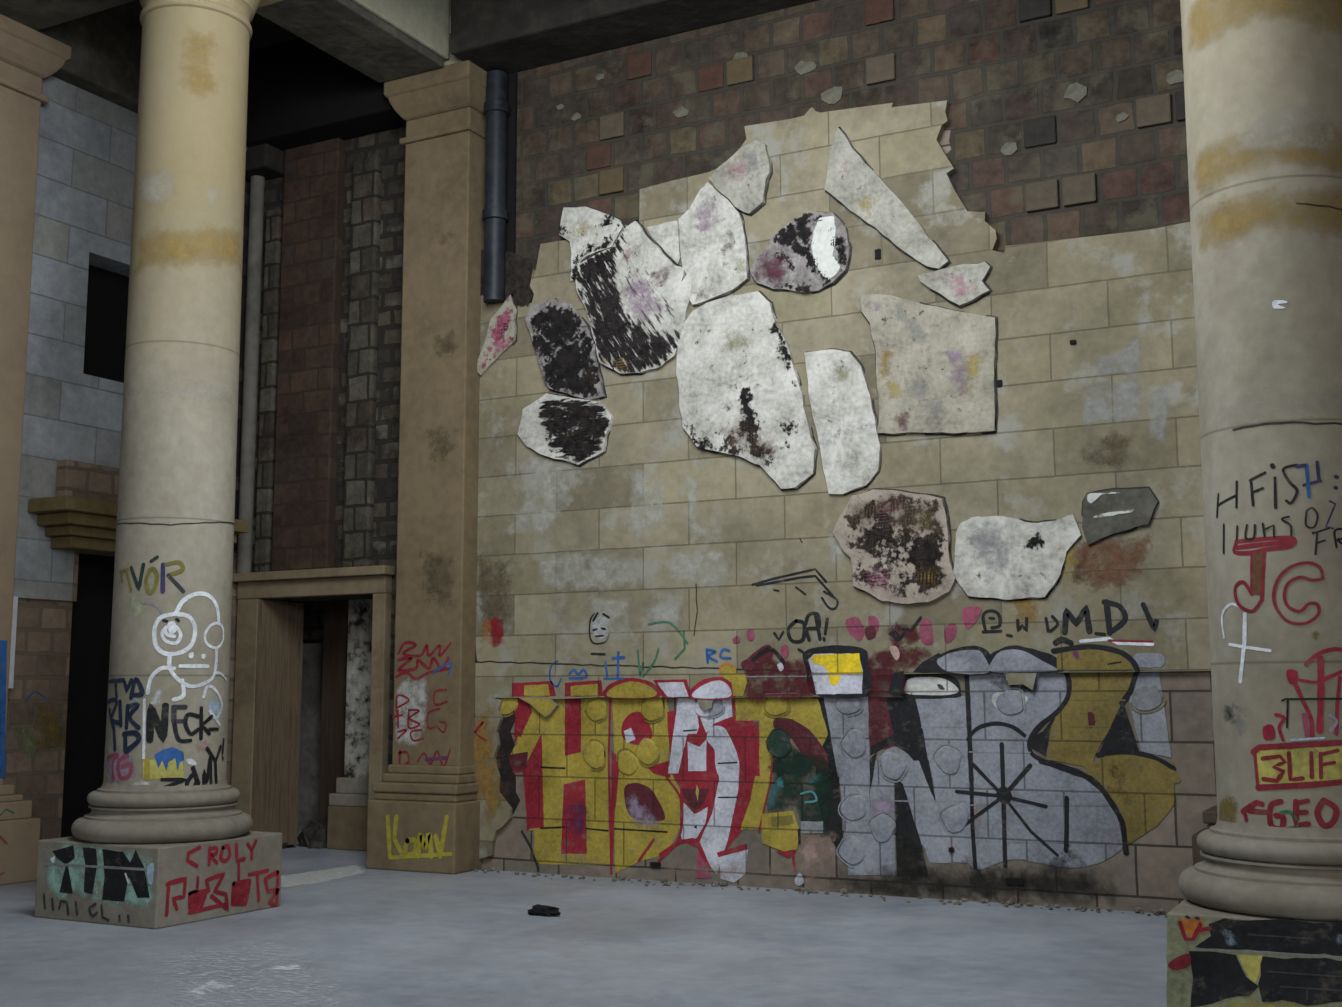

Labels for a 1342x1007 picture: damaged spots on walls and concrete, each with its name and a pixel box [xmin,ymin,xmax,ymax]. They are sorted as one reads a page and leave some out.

peeling [477,127,1082,604]
water stain [1210,194,1342,238]